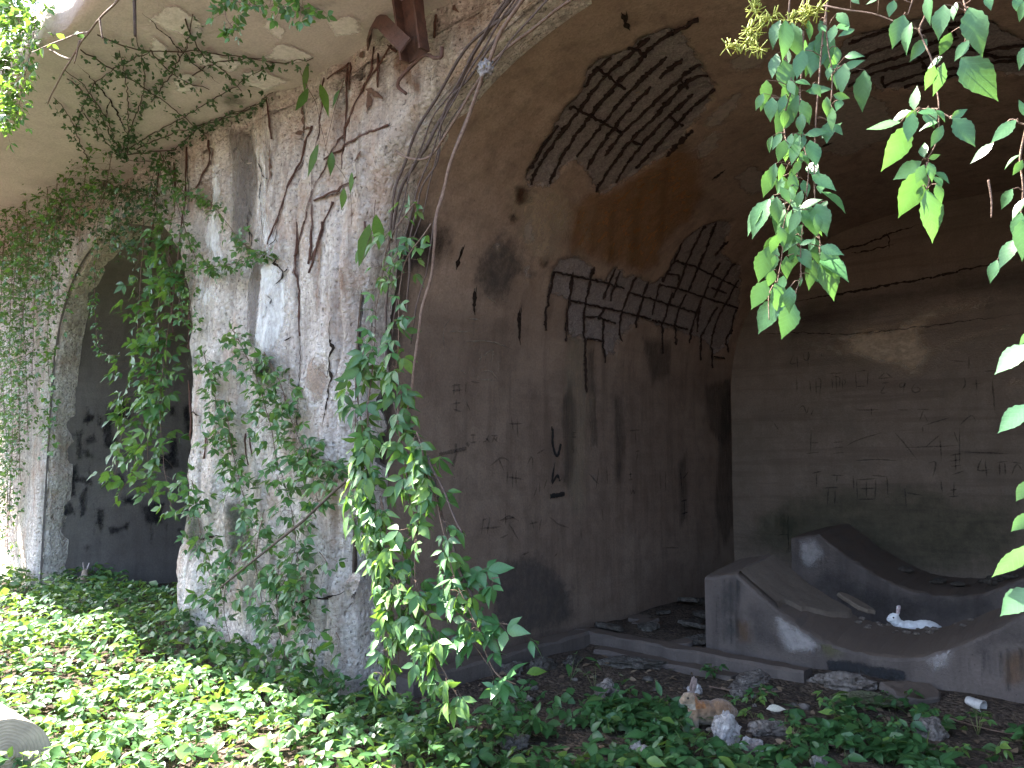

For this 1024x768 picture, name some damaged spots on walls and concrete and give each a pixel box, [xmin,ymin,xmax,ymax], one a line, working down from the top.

rust [366,88,383,114]
spalling [525,17,715,194]
crack [322,319,335,423]
spalling [543,221,742,393]